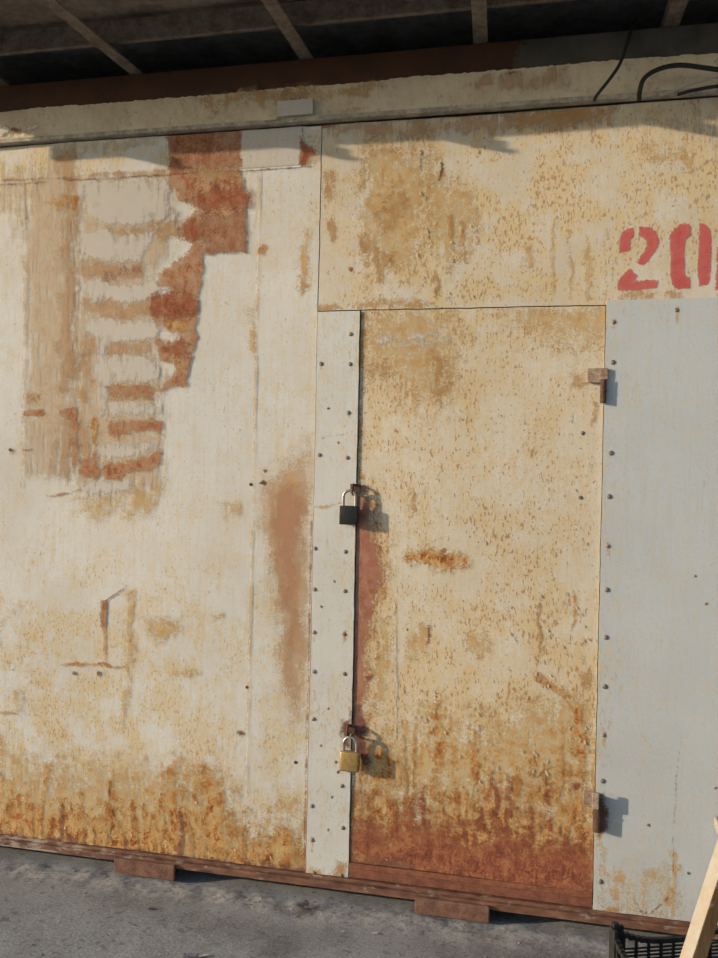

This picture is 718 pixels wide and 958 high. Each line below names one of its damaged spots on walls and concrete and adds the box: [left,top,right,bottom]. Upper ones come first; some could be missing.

corrosion [90,131,267,400]
corrosion [298,229,309,294]
corrosion [299,135,319,165]
corrosion [349,136,433,283]
corrosion [23,393,45,417]
corrosion [59,388,162,481]
corrosion [357,300,473,404]
corrosion [504,306,605,352]
corrosion [259,454,330,714]
corrosion [65,590,179,727]
corrosion [333,467,680,918]
corrosion [0,751,321,874]